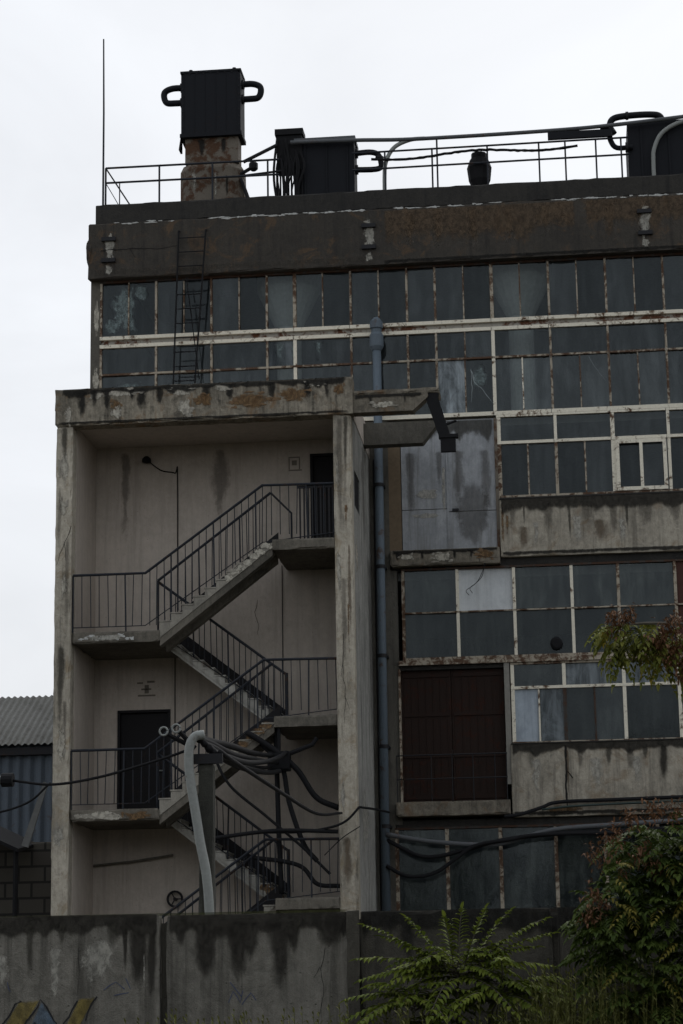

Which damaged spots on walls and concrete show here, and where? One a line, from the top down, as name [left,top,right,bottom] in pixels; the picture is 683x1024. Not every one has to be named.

spalling [554,193,683,246]
spalling [101,220,174,274]
spalling [89,368,144,419]
spalling [168,384,198,417]
leakage [446,419,492,440]
leakage [393,492,683,560]
leakage [512,739,683,786]
leakage [0,912,347,994]